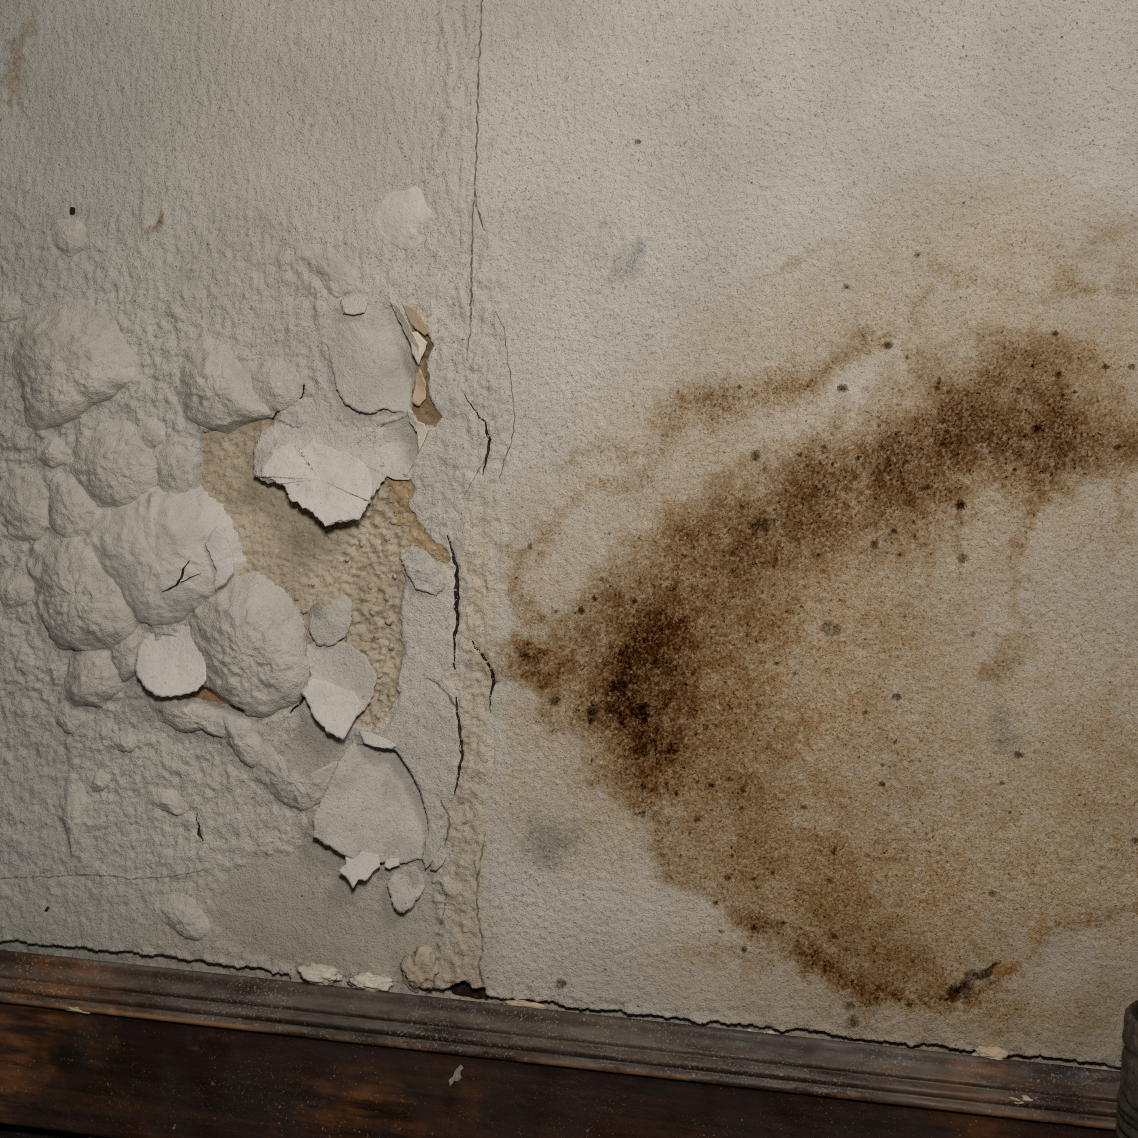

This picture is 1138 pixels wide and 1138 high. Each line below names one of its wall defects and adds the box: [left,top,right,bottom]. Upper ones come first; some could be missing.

crack [463,0,516,498]
flaking render [201,294,451,913]
crack [439,882,447,925]
crack [426,535,501,849]
crack [474,834,487,1001]
water stain [501,331,1138,1037]